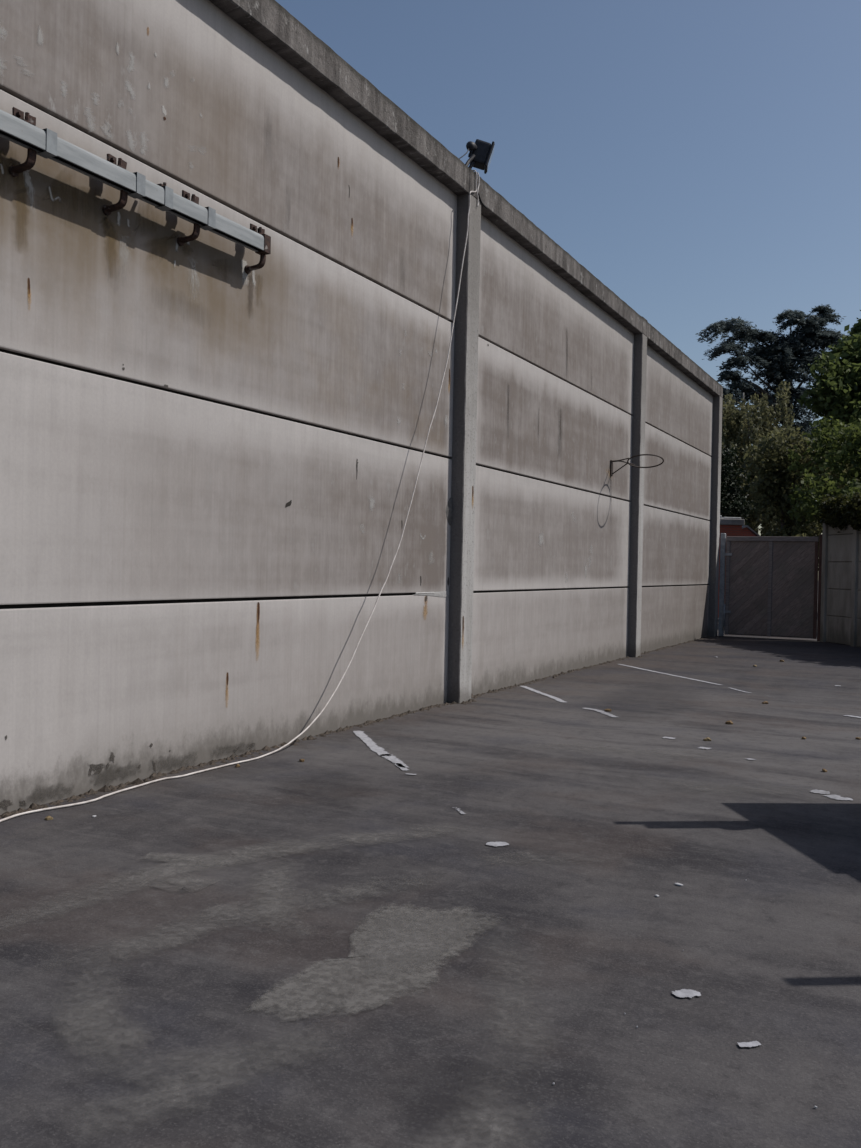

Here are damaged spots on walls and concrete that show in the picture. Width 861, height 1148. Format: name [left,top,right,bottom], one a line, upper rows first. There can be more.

leakage [241,260,255,285]
leakage [88,750,187,785]
leakage [0,787,70,810]